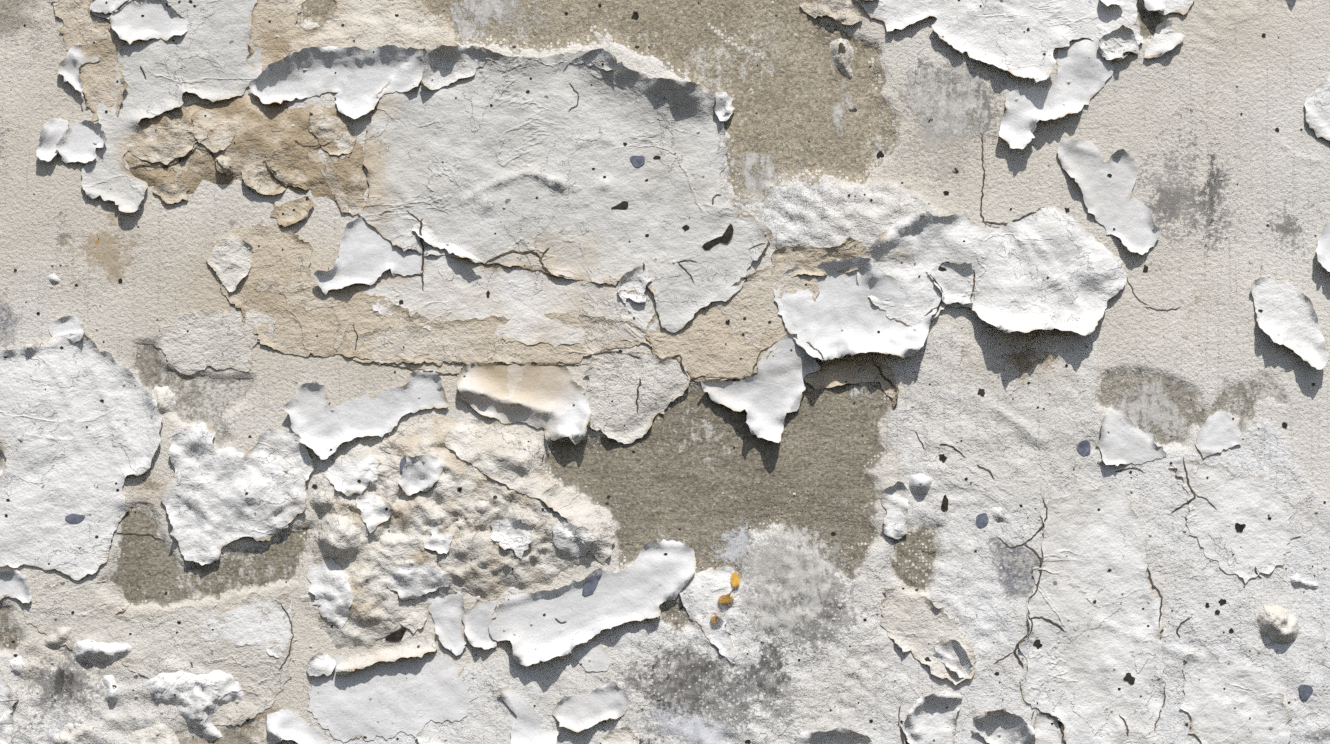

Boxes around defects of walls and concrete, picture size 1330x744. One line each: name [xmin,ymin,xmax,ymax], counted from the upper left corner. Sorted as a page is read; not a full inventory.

spalling [36,0,900,215]
peeling [856,0,1194,149]
peeling [1304,74,1330,141]
peeling [1057,139,1160,255]
peeling [1251,277,1329,370]
peeling [0,44,1127,744]
crack [1171,457,1216,513]
crack [994,499,1067,668]
crack [1147,567,1192,637]
crack [898,706,909,744]
crack [1031,708,1066,744]
crack [1119,687,1166,735]